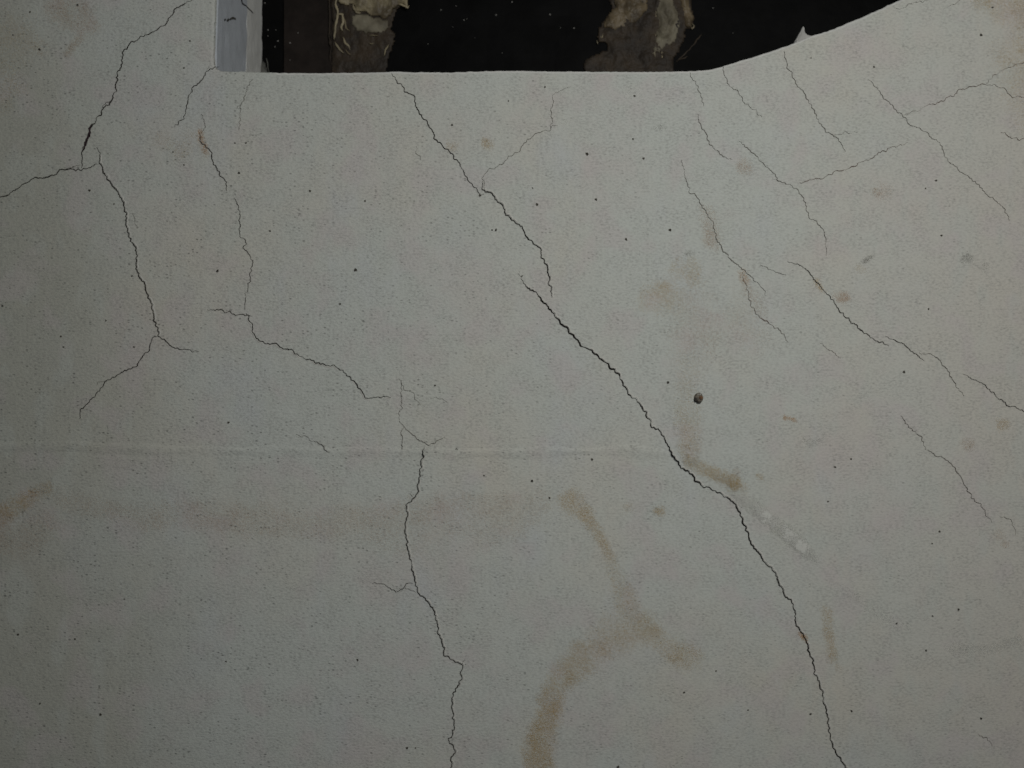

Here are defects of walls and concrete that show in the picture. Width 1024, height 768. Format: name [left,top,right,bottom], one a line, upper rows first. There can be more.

crack [1,1,196,418]
crack [174,67,465,768]
crack [392,75,849,768]
crack [682,52,1024,412]
crack [902,417,1016,535]